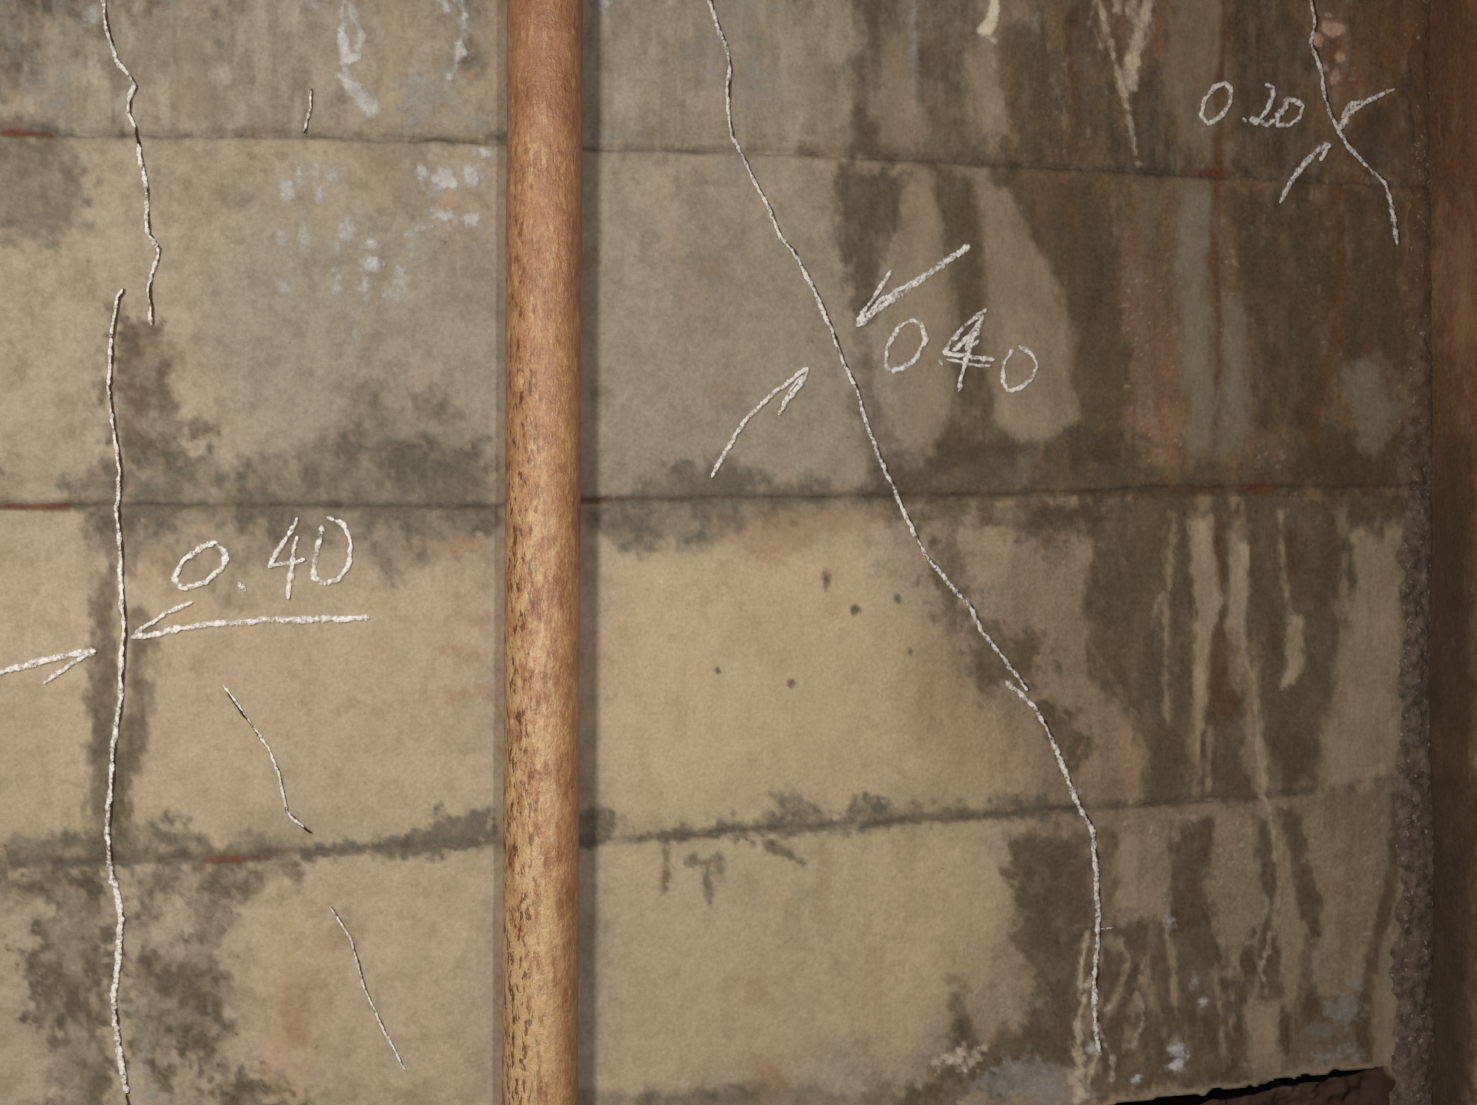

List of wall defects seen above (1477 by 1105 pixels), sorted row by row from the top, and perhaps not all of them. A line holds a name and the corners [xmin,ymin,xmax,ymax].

water stain [337,0,469,132]
crack [1312,0,1400,244]
crack [103,0,160,1105]
water stain [100,313,211,529]
crack [711,0,1102,1051]
water stain [835,0,1409,799]
water stain [19,920,230,1060]
water stain [43,603,258,901]
crack [227,692,312,833]
crack [331,906,405,1071]
water stain [293,807,495,875]
water stain [901,810,1319,1105]